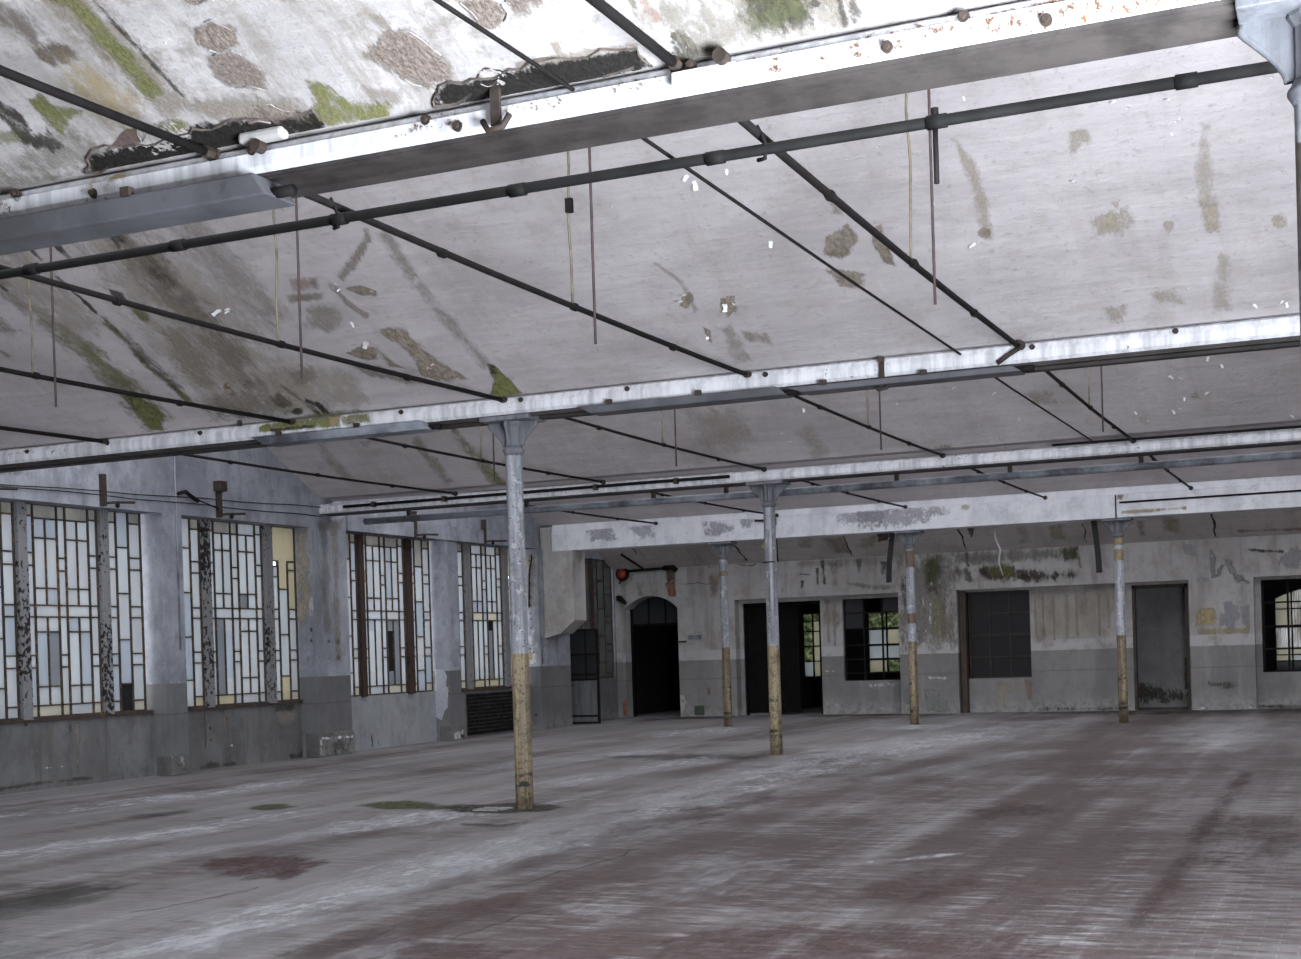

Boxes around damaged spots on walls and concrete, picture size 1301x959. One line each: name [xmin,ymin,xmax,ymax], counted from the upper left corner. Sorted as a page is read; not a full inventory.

spalling [459,0,543,29]
water stain [628,0,861,61]
corrosion [849,0,1196,59]
flaking render [83,20,327,174]
mould [0,101,63,154]
water stain [800,536,875,588]
water stain [881,525,1085,649]
peeling [1197,550,1250,584]
peeling [528,583,543,664]
peeling [1196,601,1249,634]
peeling [434,669,449,720]
spalling [454,691,514,739]